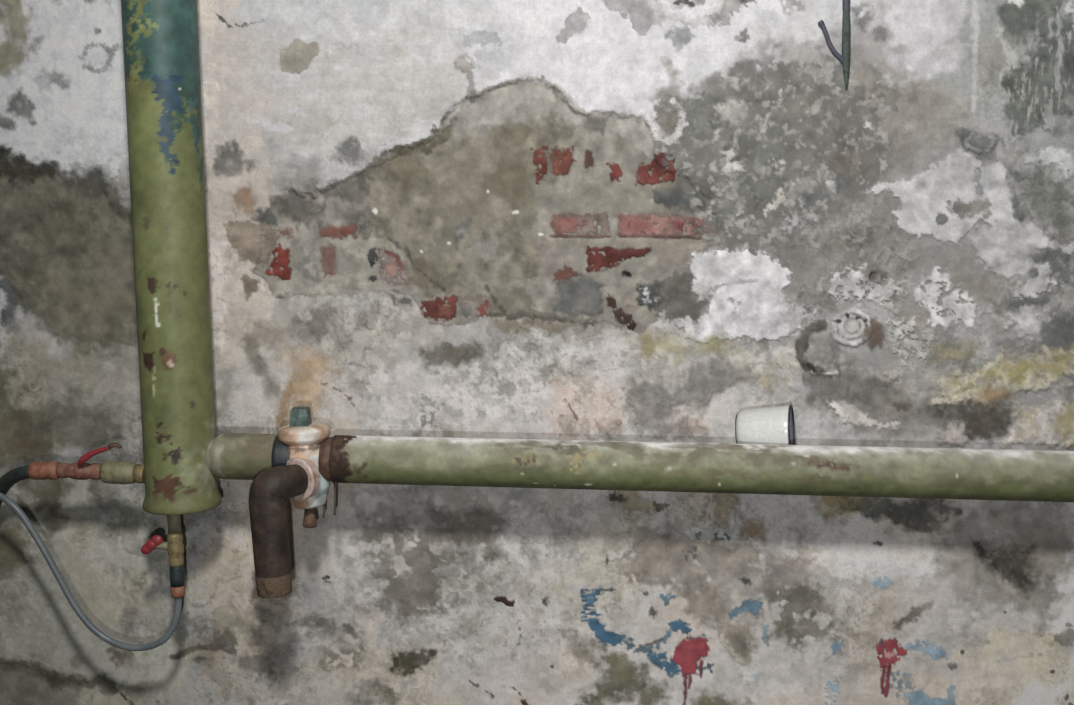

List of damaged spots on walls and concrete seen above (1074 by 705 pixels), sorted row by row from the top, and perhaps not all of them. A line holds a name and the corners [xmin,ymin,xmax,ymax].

water stain [998,0,1074,135]
water stain [0,146,137,353]
spalling [226,55,1074,343]
water stain [627,335,770,438]
peeling [829,263,992,365]
water stain [802,292,1074,447]
water stain [1010,170,1074,235]
water stain [1029,249,1074,283]